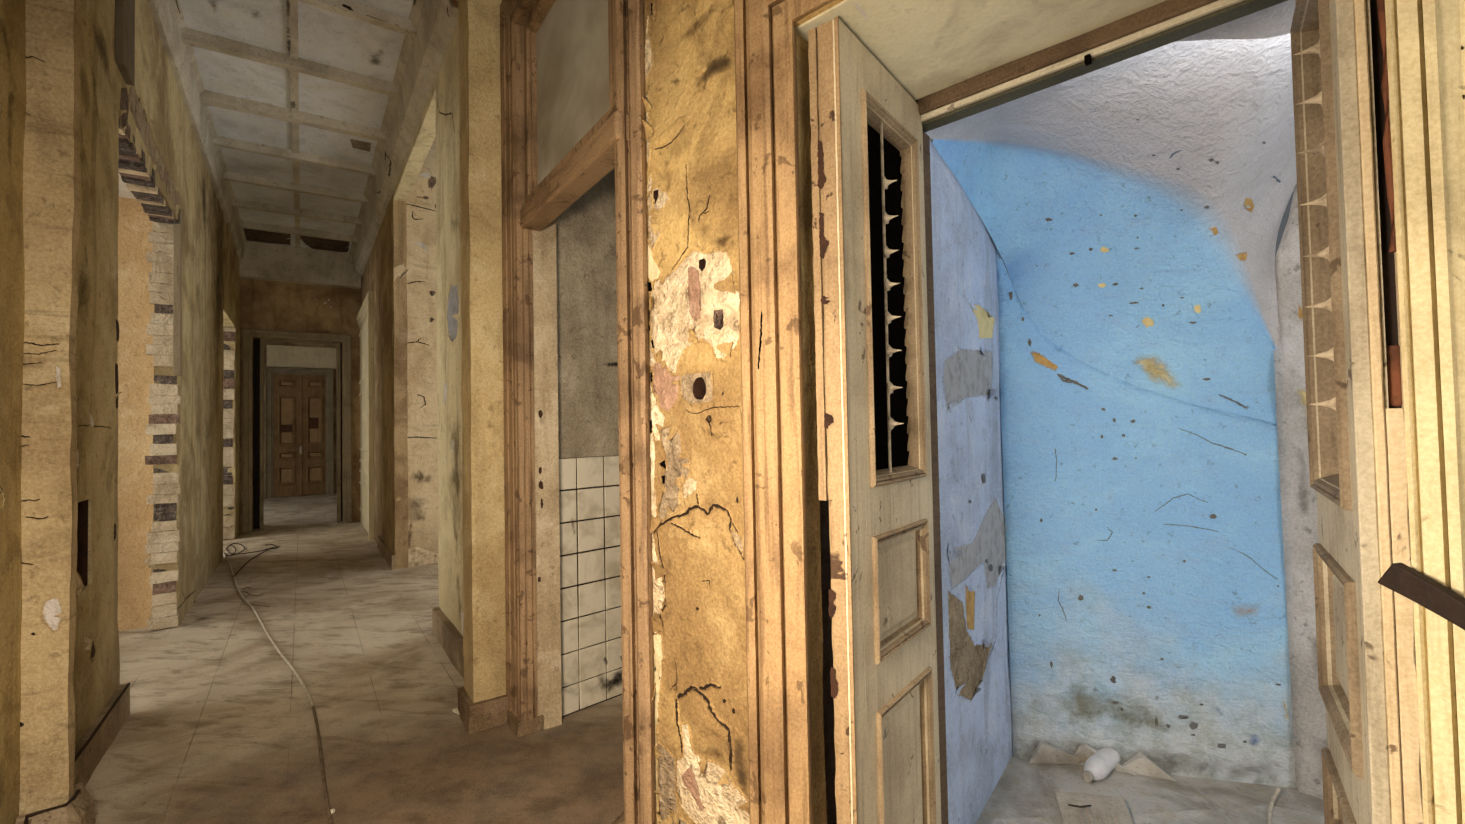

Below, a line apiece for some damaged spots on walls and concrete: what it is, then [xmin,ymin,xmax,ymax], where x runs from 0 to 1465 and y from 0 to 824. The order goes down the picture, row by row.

spalling [648,248,740,533]
spalling [31,572,85,635]
crack [651,493,745,772]
peeling [947,474,1008,702]
peeling [654,722,750,824]